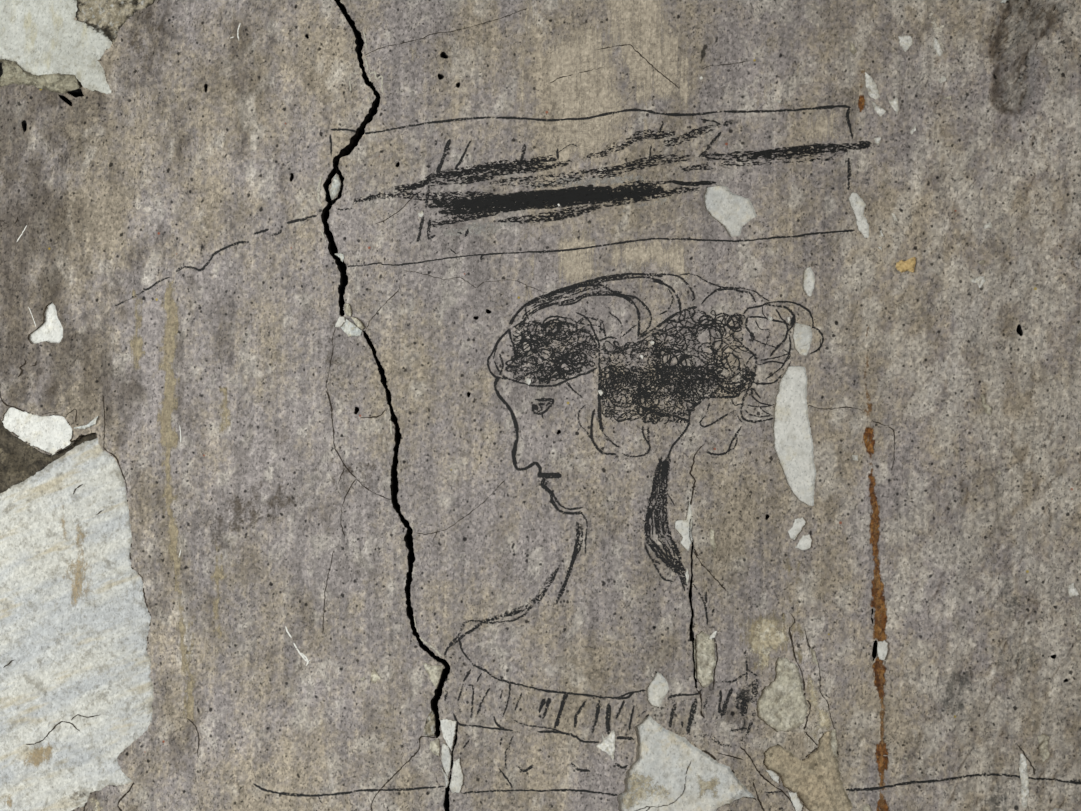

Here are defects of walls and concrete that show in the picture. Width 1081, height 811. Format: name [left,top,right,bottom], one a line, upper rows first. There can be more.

peeling [0,0,156,106]
peeling [29,303,63,344]
crack [317,0,545,811]
peeling [703,186,757,237]
peeling [773,323,816,550]
peeling [0,407,154,811]
rust [862,393,889,811]
peeling [617,671,756,811]